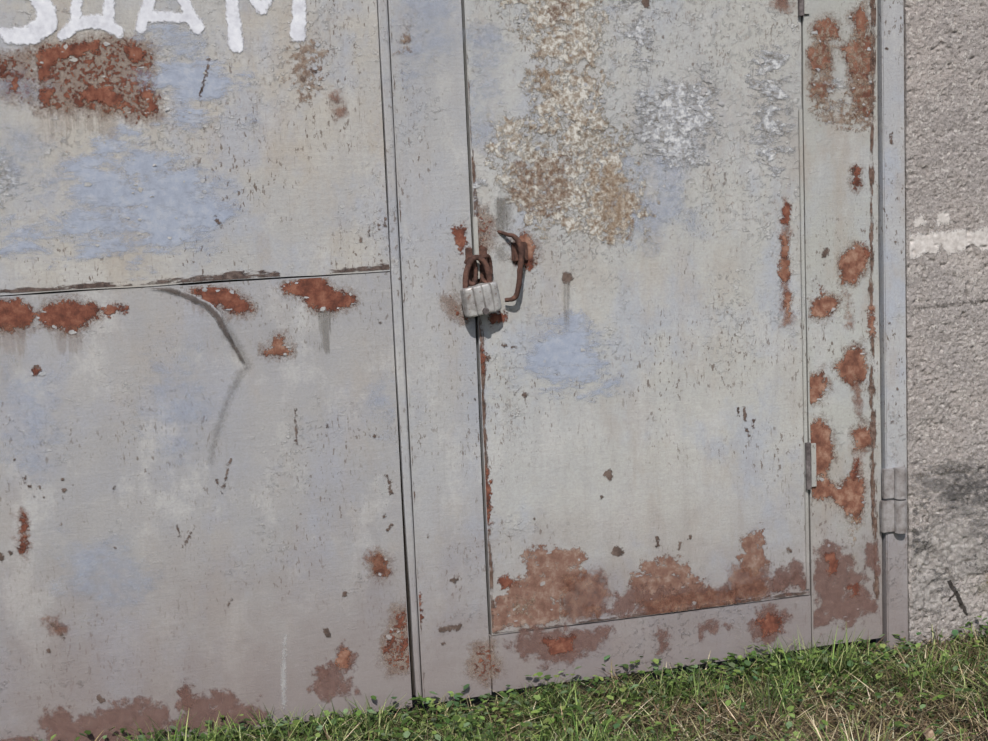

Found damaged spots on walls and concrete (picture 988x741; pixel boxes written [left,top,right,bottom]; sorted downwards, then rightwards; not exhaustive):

rust [442,0,881,669]